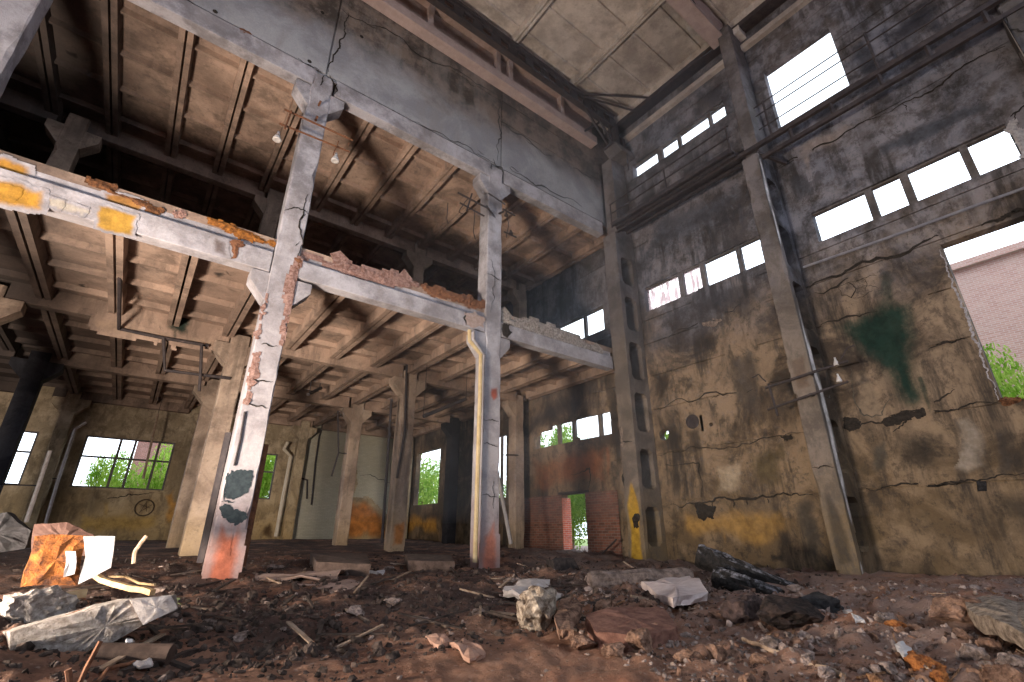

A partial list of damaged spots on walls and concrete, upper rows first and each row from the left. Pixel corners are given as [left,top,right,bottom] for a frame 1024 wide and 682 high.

crack [298,10,581,206]
rust [93,190,145,239]
rust [230,239,245,259]
spalling [279,250,485,346]
spalling [501,307,604,354]
leakage [758,157,784,251]
crack [809,235,939,326]
leakage [677,273,864,574]
spalling [883,407,926,427]
leakage [844,273,1024,563]
crack [866,473,1024,491]
rust [202,506,248,579]